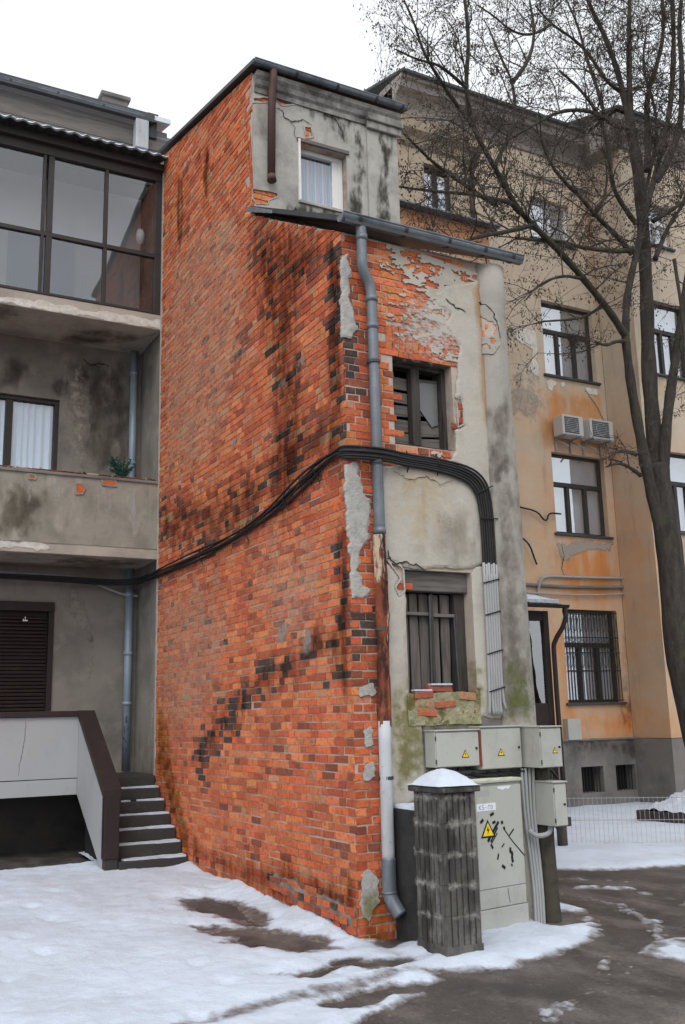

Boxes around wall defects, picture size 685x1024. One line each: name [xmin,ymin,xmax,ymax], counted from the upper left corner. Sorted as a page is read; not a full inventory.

spalling [341,235,477,463]